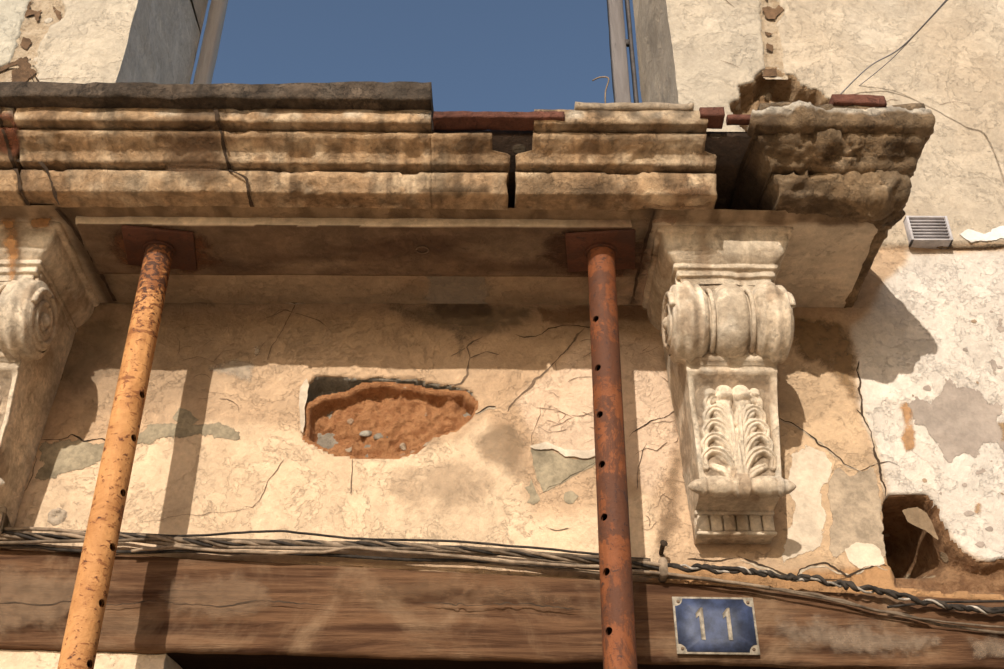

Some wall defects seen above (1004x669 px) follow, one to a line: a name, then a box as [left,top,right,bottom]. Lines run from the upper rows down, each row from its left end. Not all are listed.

crack [213,107,254,207]
crack [24,434,105,491]
peeling [35,439,105,480]
peeling [137,408,240,444]
spalling [299,377,478,459]
crack [448,337,499,386]
crack [475,325,593,445]
peeling [525,442,595,505]
crack [631,411,678,487]
crack [779,362,900,496]
peeling [906,378,1004,463]
peeling [782,445,1004,596]